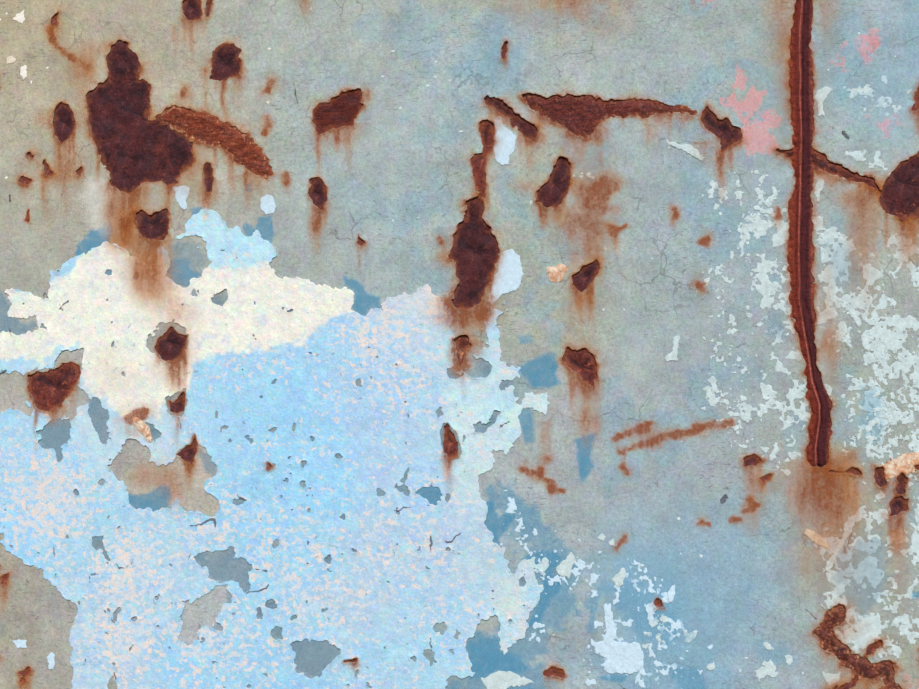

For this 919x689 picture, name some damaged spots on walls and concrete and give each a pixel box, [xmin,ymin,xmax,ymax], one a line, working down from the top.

corrosion [50,39,214,285]
spalling [156,105,274,190]
corrosion [312,88,369,152]
corrosion [438,95,543,372]
peeling [494,116,517,165]
spalling [518,93,697,142]
corrosion [848,151,919,241]
peeling [701,170,811,476]
corrosion [27,362,81,424]
peeling [0,185,698,689]
peeling [805,216,919,660]
corrosion [812,604,902,689]